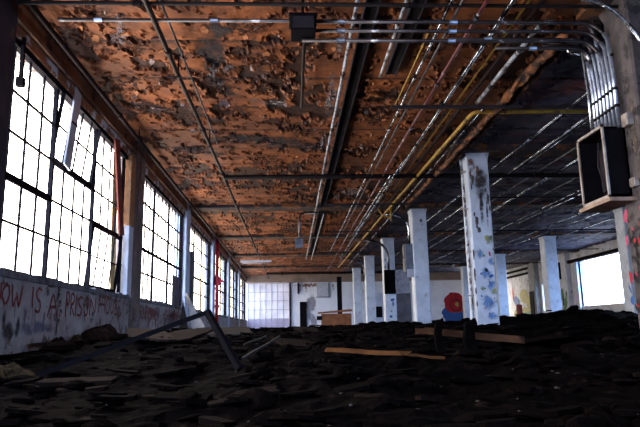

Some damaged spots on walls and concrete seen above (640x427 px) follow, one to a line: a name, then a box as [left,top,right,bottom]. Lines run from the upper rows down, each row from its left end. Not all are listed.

peeling [57,5,197,133]
peeling [190,16,297,126]
peeling [292,37,337,61]
peeling [419,35,458,64]